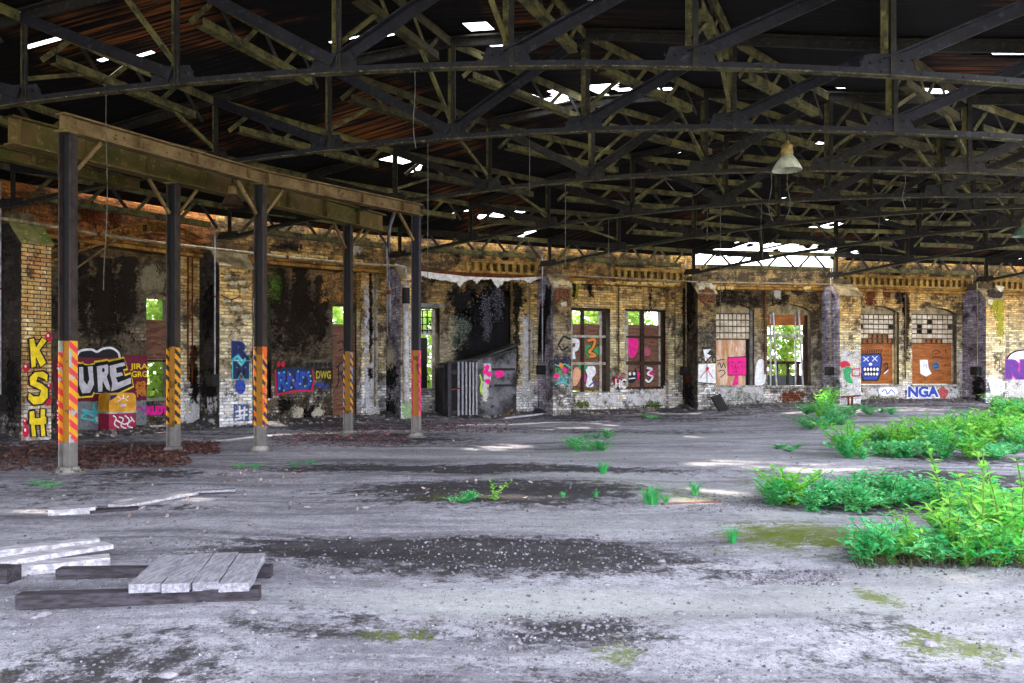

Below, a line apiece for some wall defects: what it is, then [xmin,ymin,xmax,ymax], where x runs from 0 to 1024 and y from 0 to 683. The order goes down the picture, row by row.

leakage [78,254,141,351]
leakage [270,266,329,359]
peeling [320,272,378,415]
peeling [421,271,541,288]